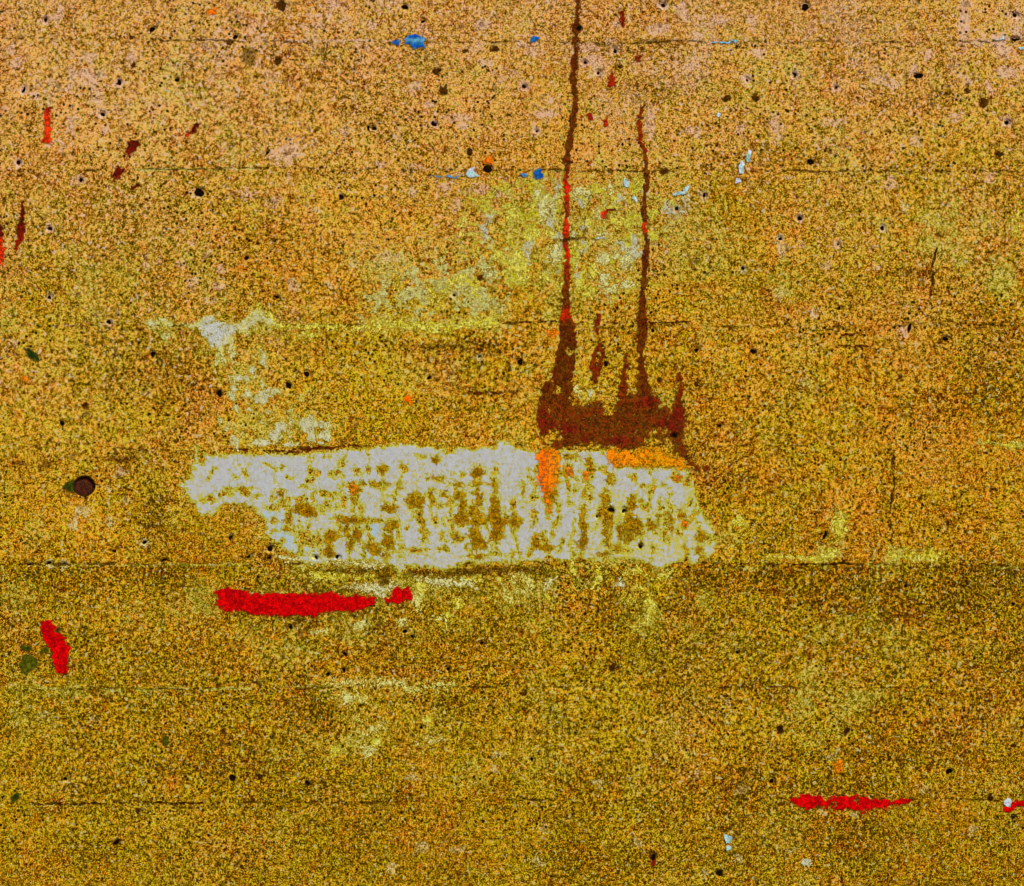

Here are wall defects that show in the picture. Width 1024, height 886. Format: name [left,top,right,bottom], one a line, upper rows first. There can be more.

peeling [177,439,718,584]